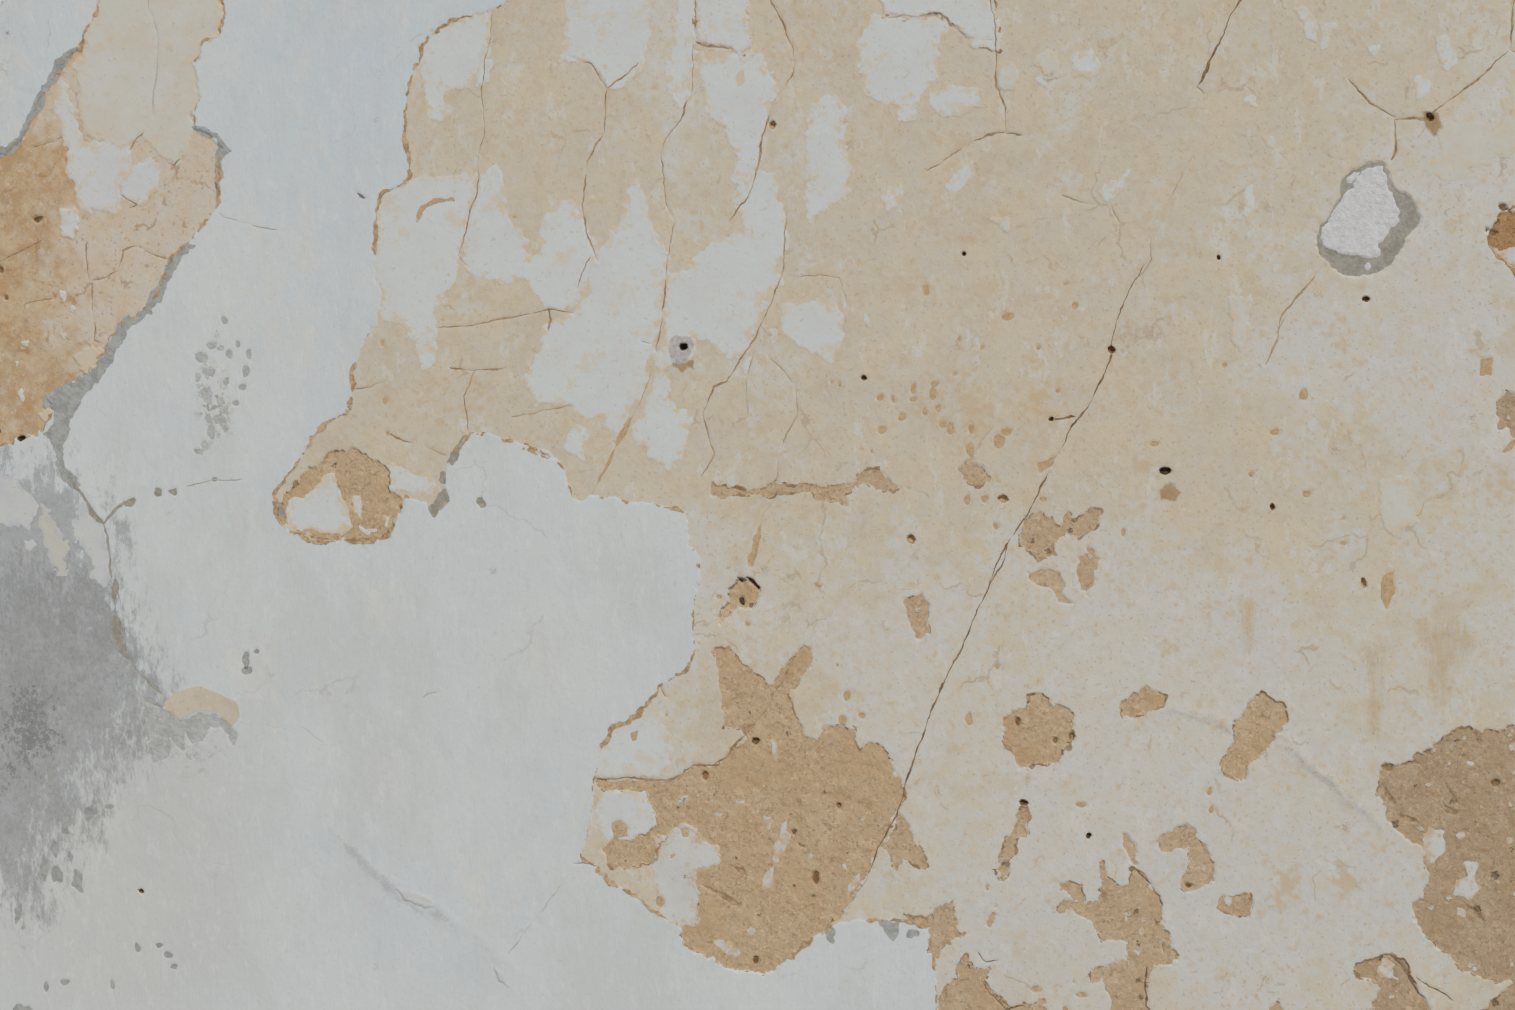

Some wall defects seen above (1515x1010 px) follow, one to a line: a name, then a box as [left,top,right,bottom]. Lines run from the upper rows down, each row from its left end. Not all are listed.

peeling [0,0,231,588]
spalling [276,448,403,544]
crack [439,62,638,330]
crack [592,0,729,494]
crack [701,212,848,561]
crack [848,244,1152,909]
crack [1197,0,1242,93]
spalling [1317,162,1420,276]
crack [1350,0,1515,160]
peeling [580,776,669,921]
spalling [1353,952,1429,1010]
spalling [1376,724,1515,1010]